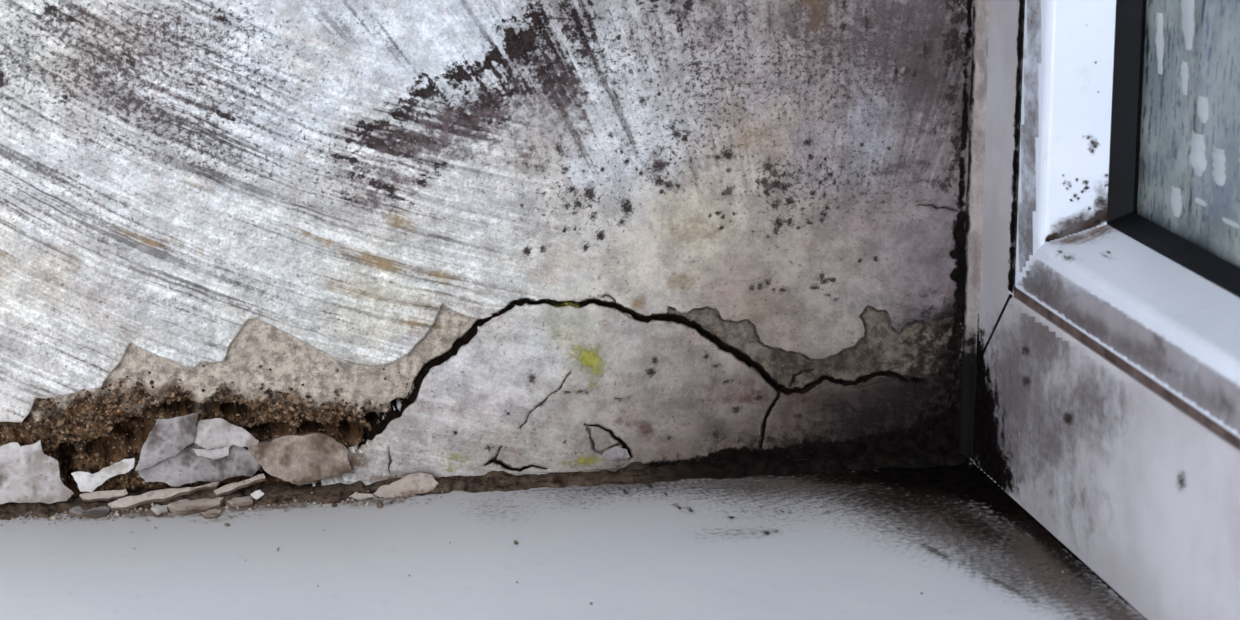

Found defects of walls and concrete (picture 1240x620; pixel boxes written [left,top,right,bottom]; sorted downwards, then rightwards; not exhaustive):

damp [0,0,974,469]
spalling [0,299,492,498]
peeling [348,492,375,500]
crack [357,295,928,473]
peeling [667,305,964,388]
damp [744,319,1124,607]